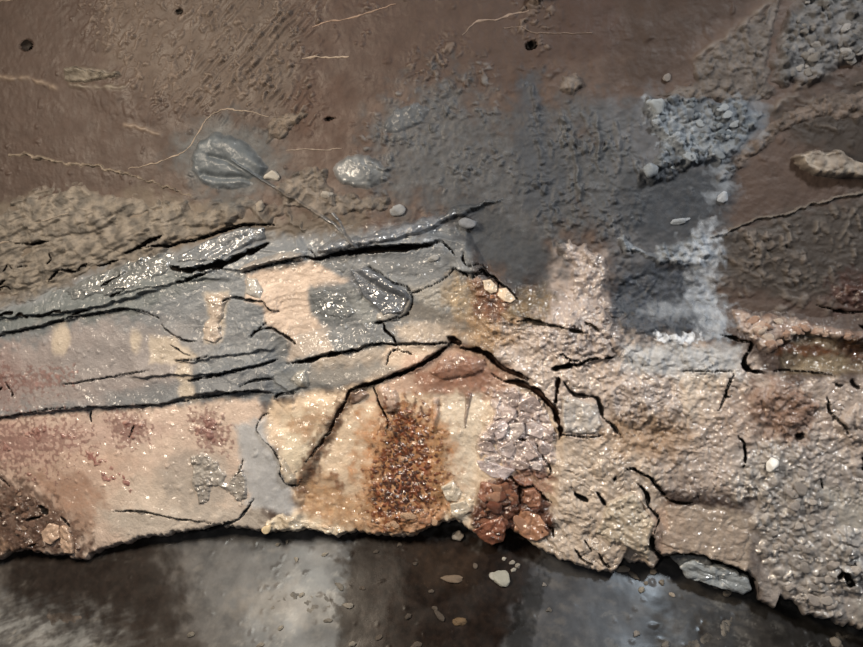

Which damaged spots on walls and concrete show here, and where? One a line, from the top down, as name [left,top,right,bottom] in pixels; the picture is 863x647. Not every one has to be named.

damp [369,81,739,372]
crack [0,213,621,486]
crack [684,335,860,434]
corrosion [777,332,863,376]
damp [11,541,185,647]
crack [116,499,254,533]
corrosion [293,358,555,647]
crack [509,438,552,503]
crack [574,467,756,592]
crack [739,438,747,468]
damp [760,602,863,647]
crack [837,563,857,588]